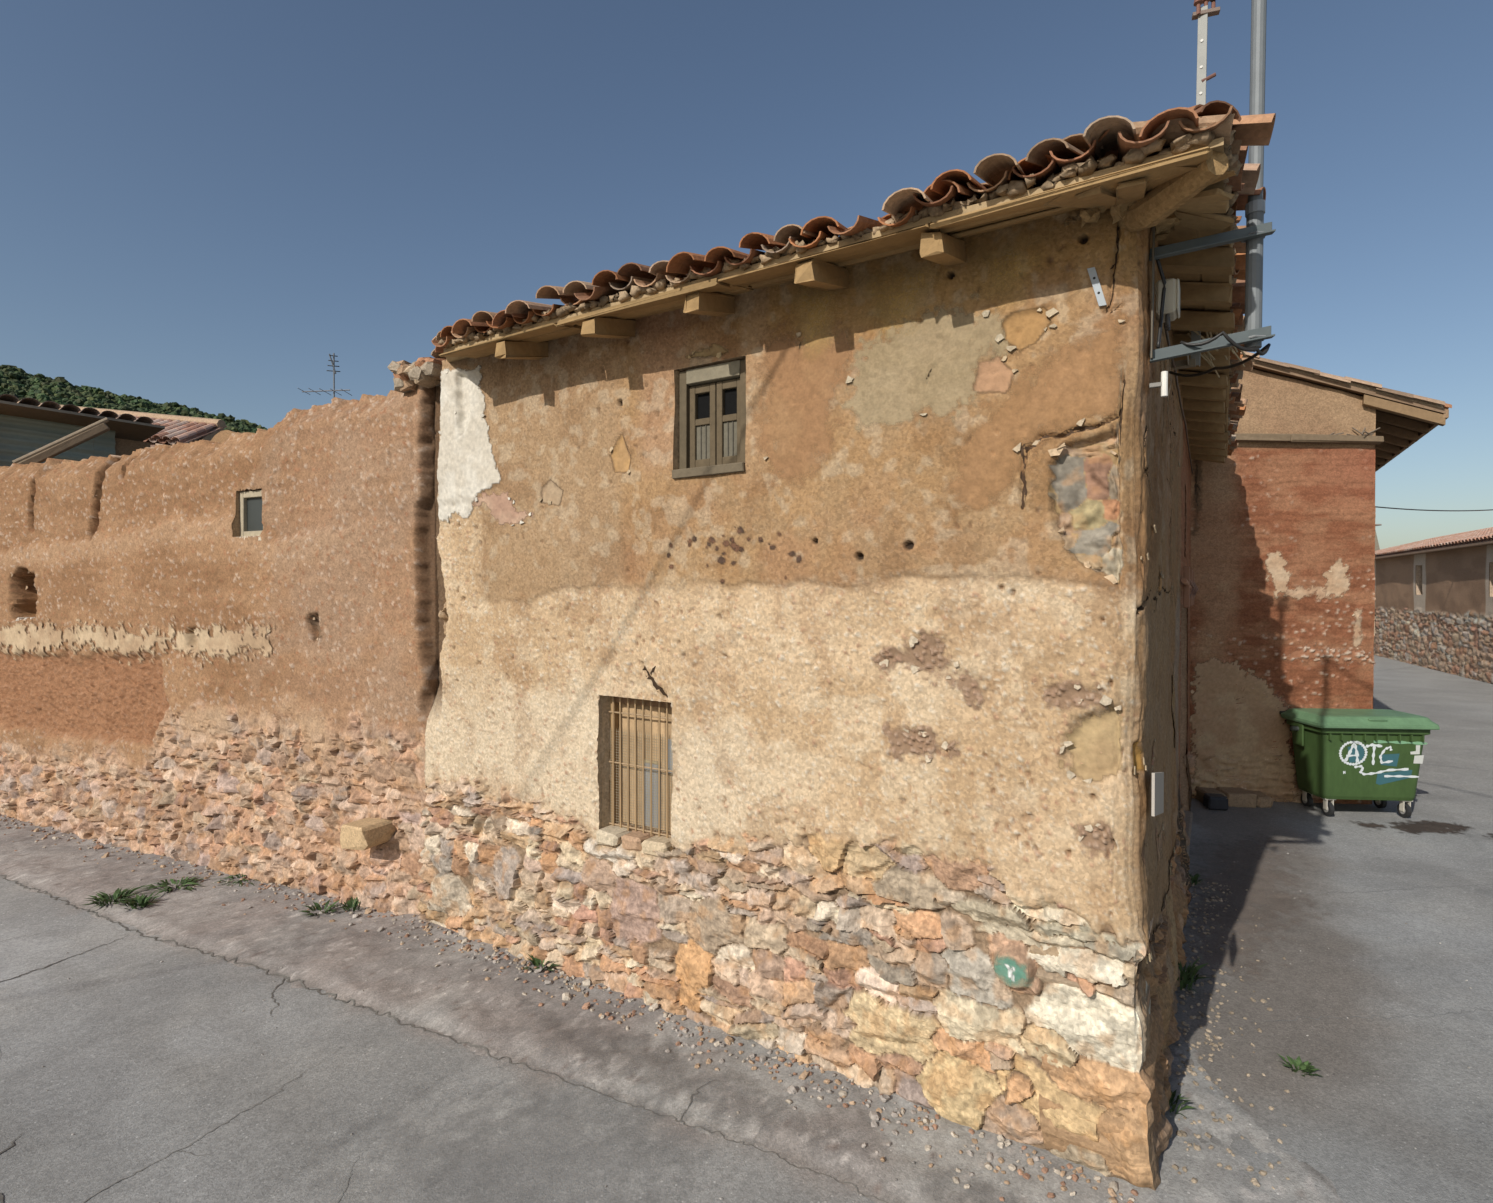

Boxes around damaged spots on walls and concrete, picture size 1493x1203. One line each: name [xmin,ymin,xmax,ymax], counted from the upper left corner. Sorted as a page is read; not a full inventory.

flaking render [437,365,563,526]
crack [1136,576,1170,614]
flaking render [1265,551,1350,600]
spalling [1282,609,1375,665]
flaking render [1189,657,1298,802]